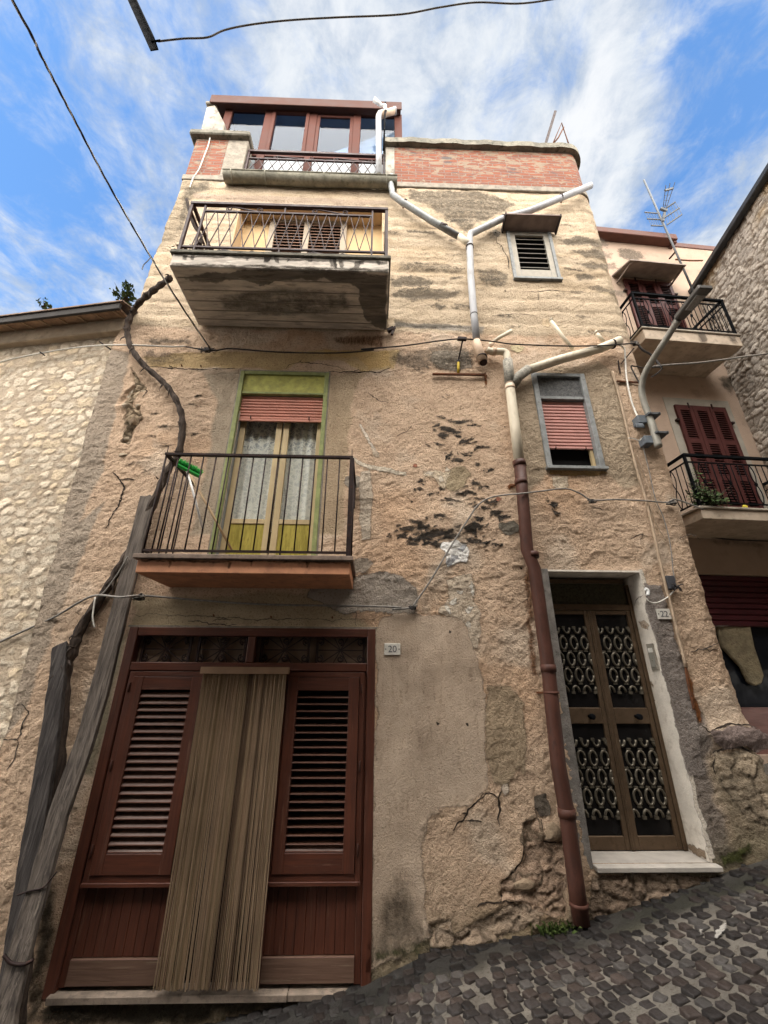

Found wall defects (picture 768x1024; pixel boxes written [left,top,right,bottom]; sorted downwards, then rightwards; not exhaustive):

damp [409,189,512,242]
damp [173,253,469,330]
damp [480,270,508,287]
damp [561,236,643,296]
flaking render [119,370,157,465]
crack [106,472,134,528]
crack [453,787,502,831]
flaking render [520,815,562,847]
peeling [687,775,715,859]
flaking render [502,871,543,893]